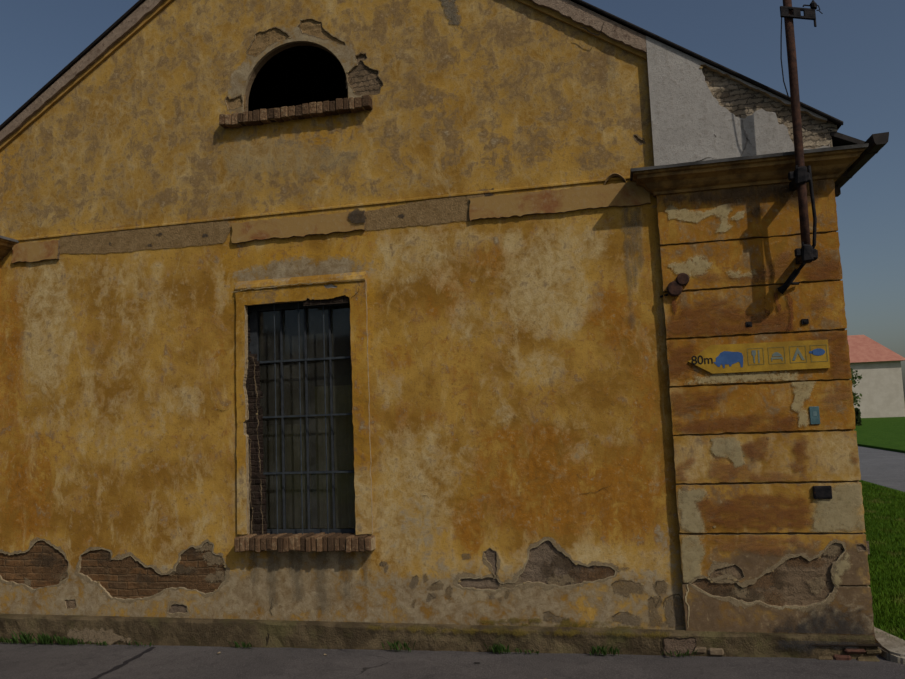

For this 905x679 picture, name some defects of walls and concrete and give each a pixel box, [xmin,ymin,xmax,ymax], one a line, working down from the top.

flaking render [246,18,346,57]
flaking render [346,52,383,96]
flaking render [699,66,837,149]
peeling [665,202,745,232]
peeling [669,344,816,427]
flaking render [246,354,267,536]
peeling [710,437,808,481]
flaking render [0,537,230,617]
flaking render [409,537,685,627]
flaking render [678,483,870,612]